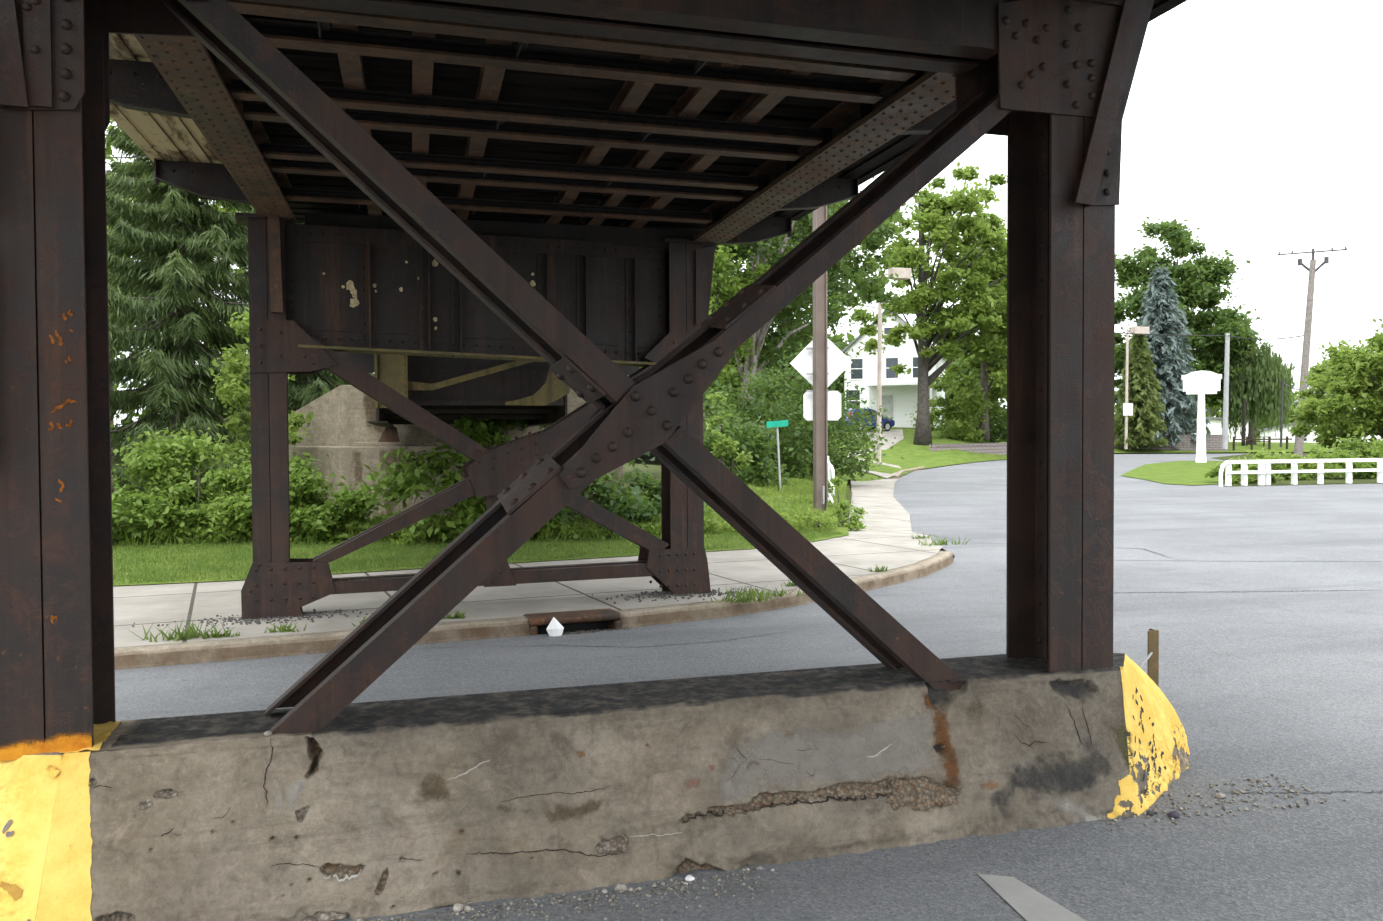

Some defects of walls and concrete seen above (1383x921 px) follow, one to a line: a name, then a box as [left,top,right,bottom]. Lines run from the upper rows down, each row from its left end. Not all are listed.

peeling [341,280,377,307]
crack [263,742,273,807]
spalling [305,737,322,777]
rust [925,694,959,787]
peeling [1124,688,1166,794]
peeling [0,881,22,901]
spalling [308,863,363,882]
spalling [375,857,402,895]
spalling [95,912,135,921]